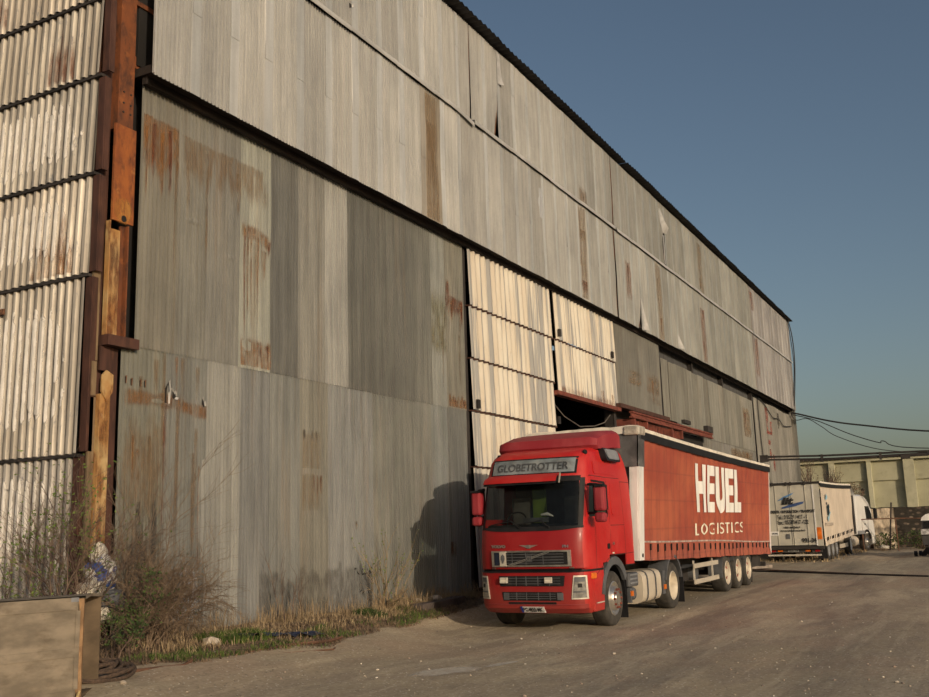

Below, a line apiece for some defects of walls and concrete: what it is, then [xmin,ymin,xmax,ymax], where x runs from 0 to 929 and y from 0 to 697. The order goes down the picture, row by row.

rust [143,114,179,190]